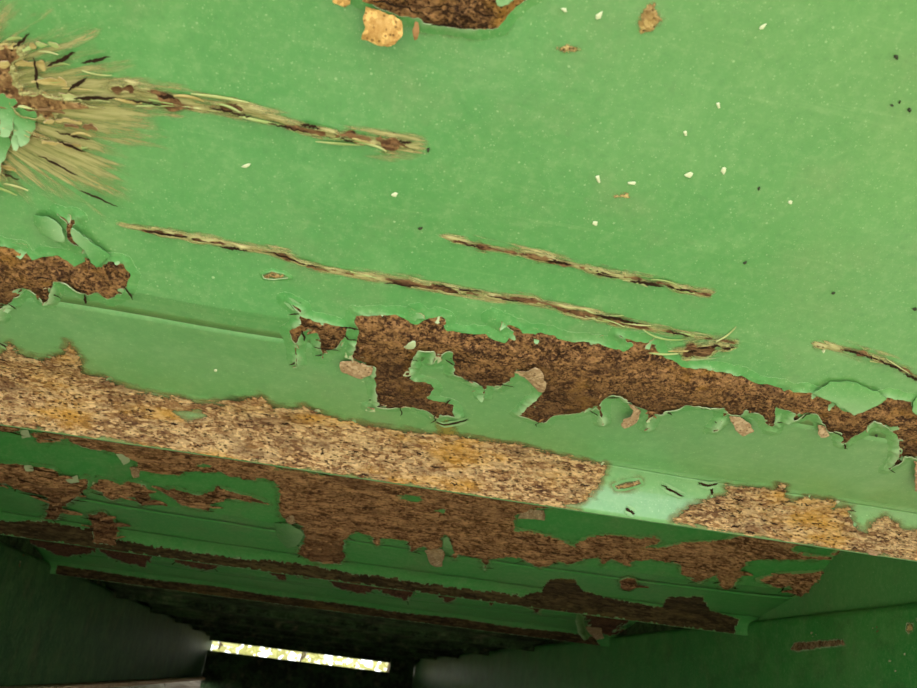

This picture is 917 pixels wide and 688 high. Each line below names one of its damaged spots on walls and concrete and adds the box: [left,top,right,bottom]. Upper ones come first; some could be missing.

peeling [332,0,544,47]
peeling [0,41,85,102]
crack [11,34,426,158]
peeling [0,93,98,175]
rust [259,268,293,281]
crack [37,130,737,361]
crack [813,341,917,381]
rust [0,292,917,646]
rust [790,638,846,653]